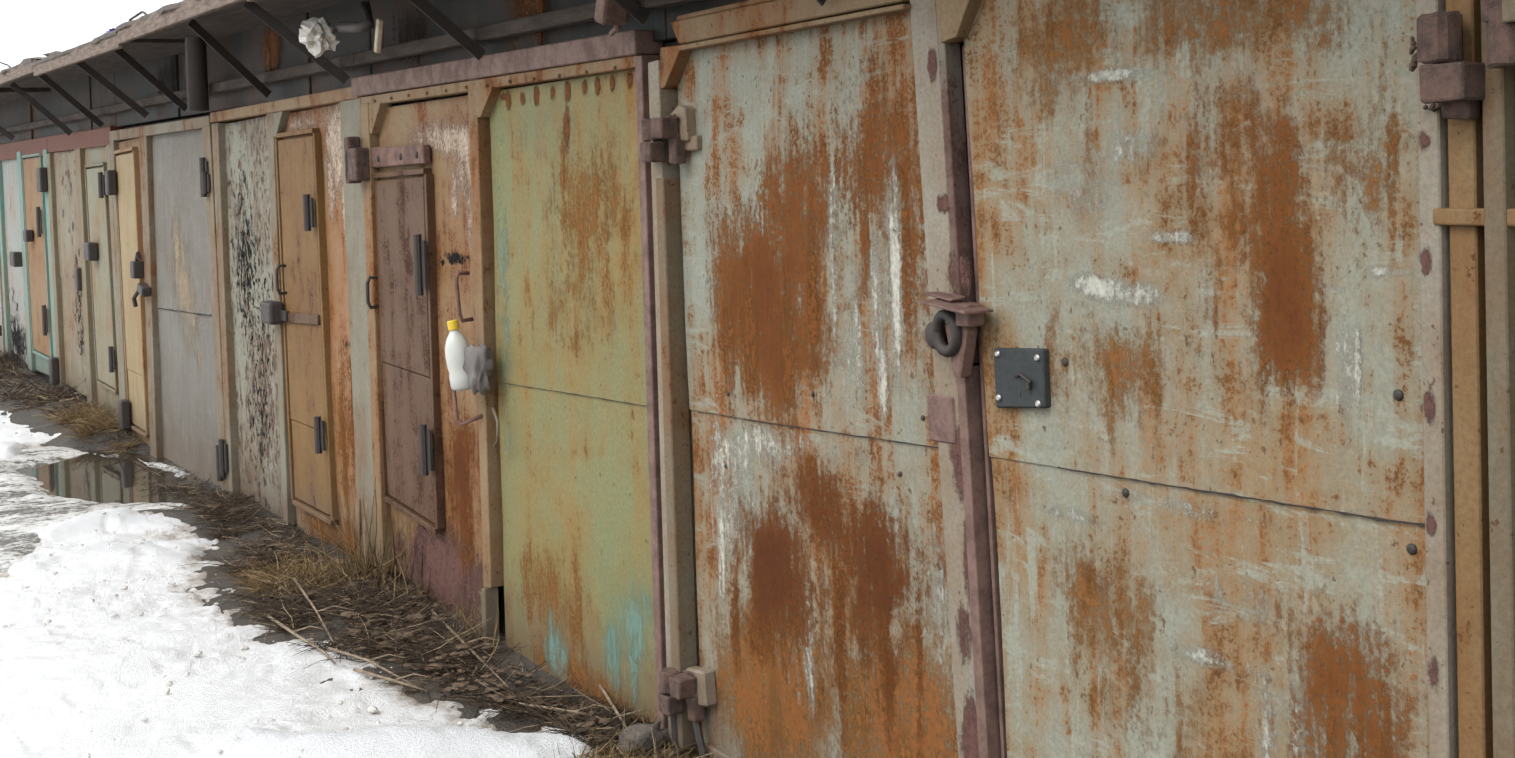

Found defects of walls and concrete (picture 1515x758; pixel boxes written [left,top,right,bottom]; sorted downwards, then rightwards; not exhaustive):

rust [1012,0,1117,188]
rust [500,73,633,357]
rust [705,51,934,434]
rust [1134,0,1430,423]
rust [1420,249,1432,275]
rust [1423,387,1435,423]
rust [395,409,483,626]
rust [520,542,649,721]
rust [711,447,959,758]
rust [1052,543,1203,758]
rust [1273,586,1438,758]
rust [1425,515,1436,536]